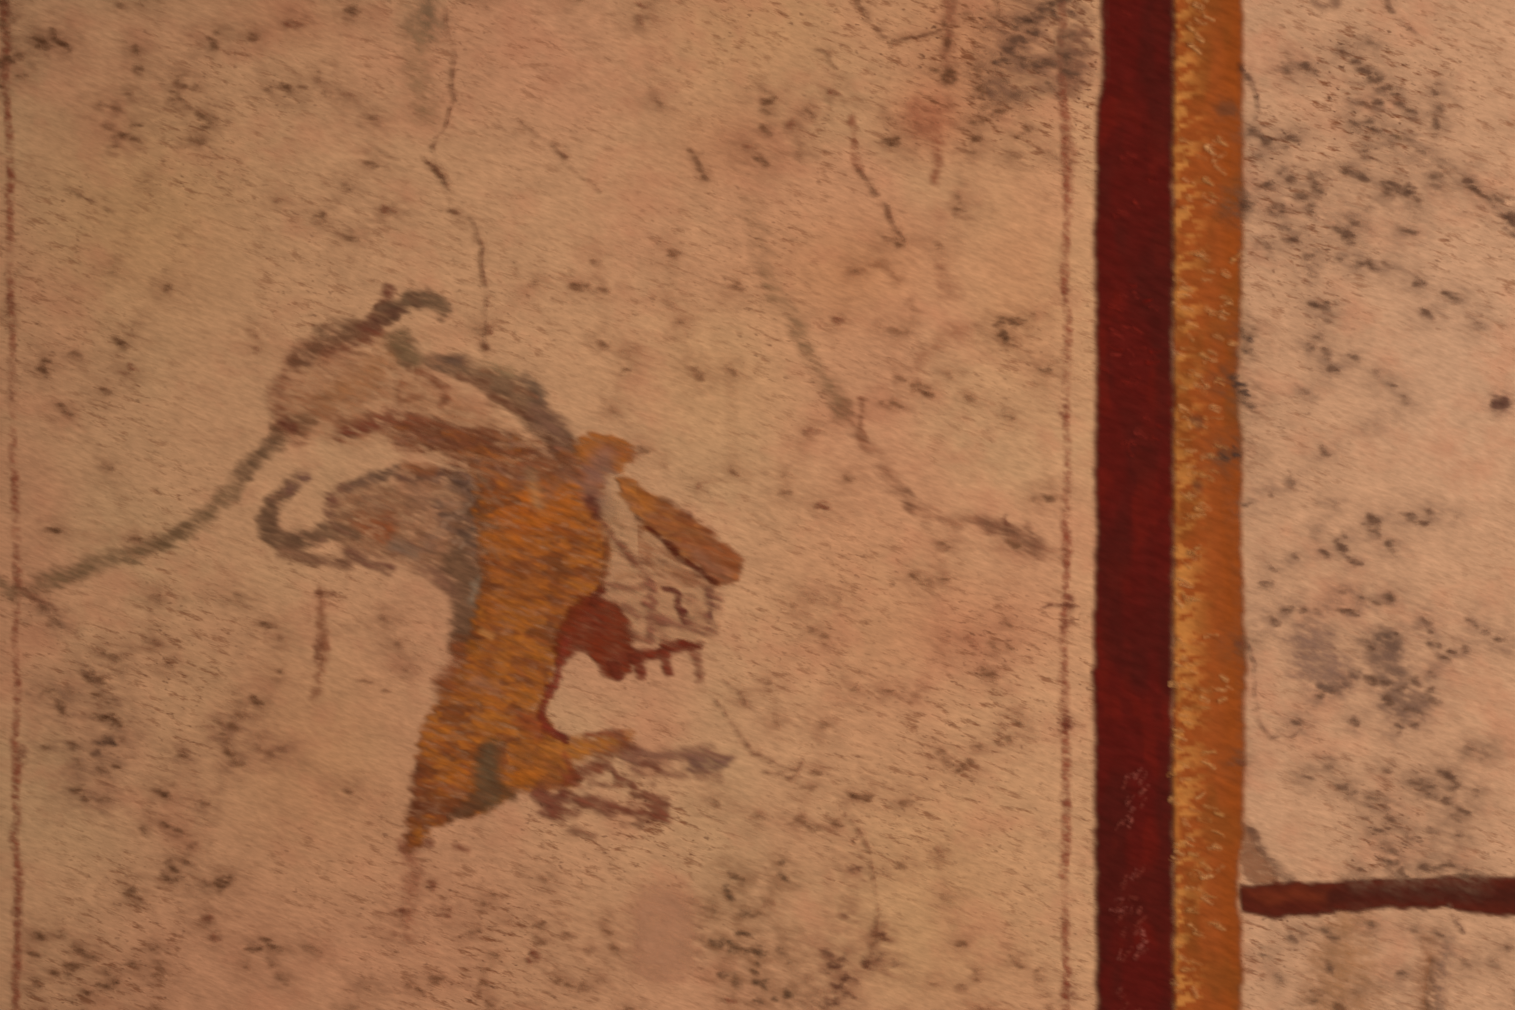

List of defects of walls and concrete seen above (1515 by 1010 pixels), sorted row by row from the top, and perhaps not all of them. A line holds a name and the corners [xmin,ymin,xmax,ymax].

crack [427,70,454,176]
crack [452,210,486,285]